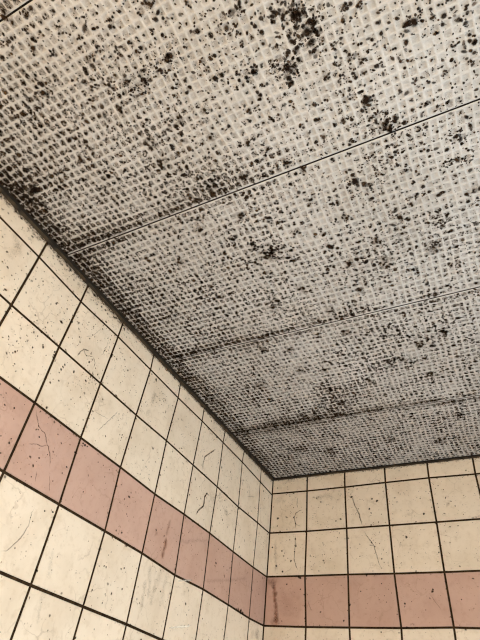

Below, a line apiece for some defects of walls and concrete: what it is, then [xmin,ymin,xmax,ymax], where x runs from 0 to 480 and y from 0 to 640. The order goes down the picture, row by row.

water stain [0,0,480,482]